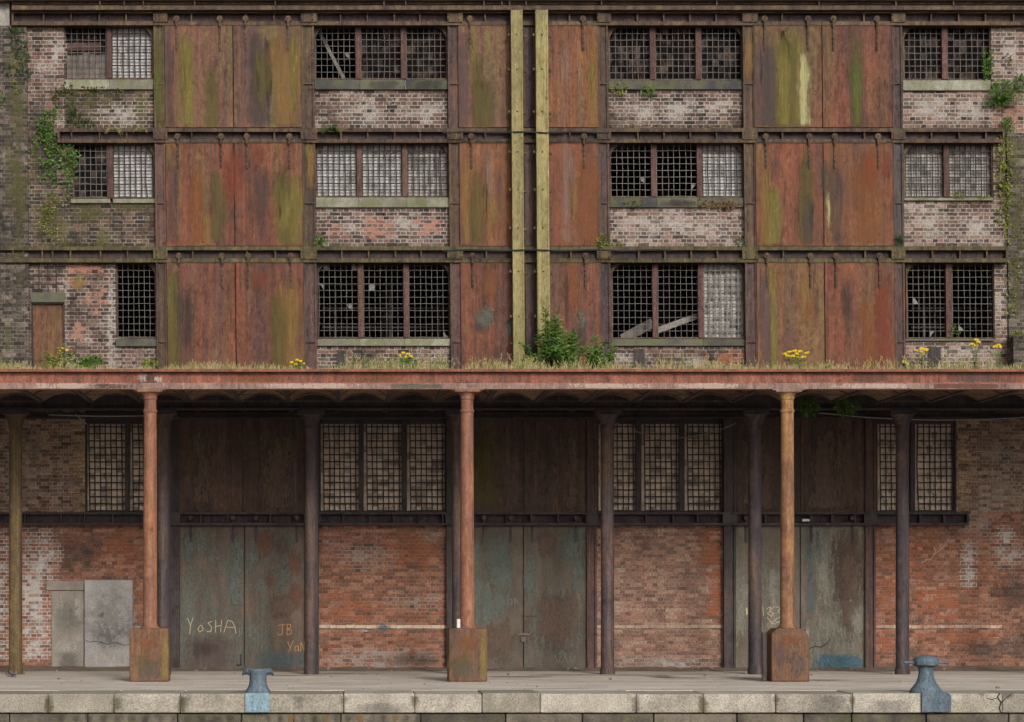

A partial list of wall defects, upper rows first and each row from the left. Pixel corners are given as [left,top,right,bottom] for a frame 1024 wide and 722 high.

damp [754,35,810,126]
corrosion [272,286,303,369]
peeling [225,533,258,607]